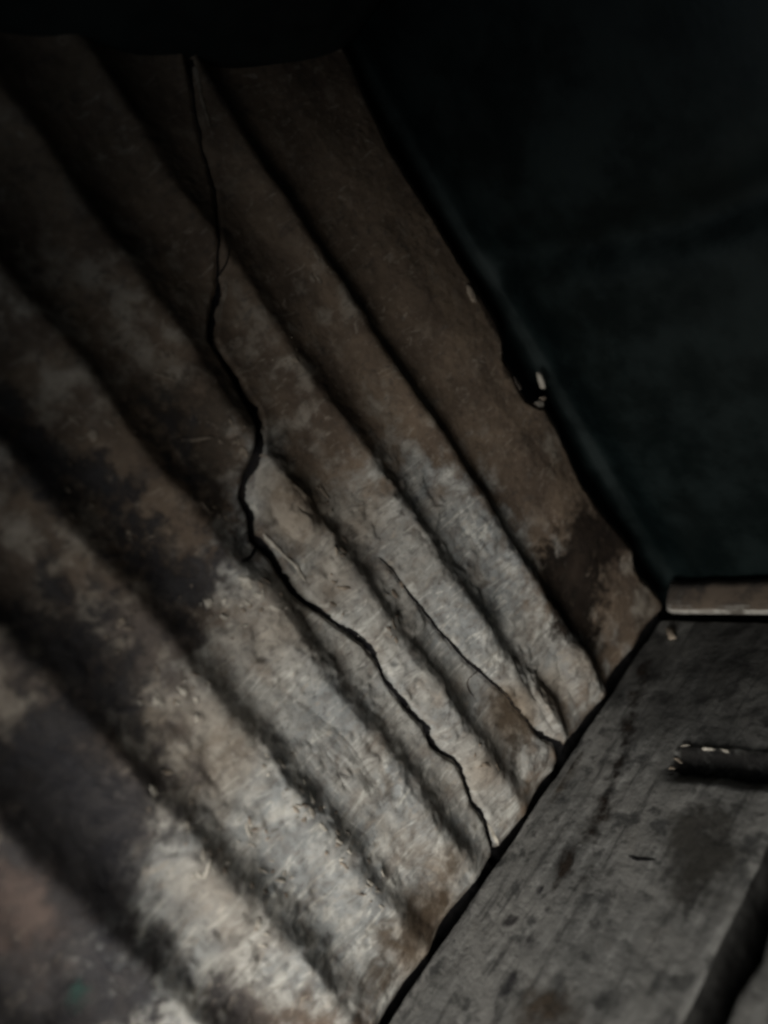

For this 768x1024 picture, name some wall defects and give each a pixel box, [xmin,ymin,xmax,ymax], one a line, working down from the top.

crack [186,58,499,851]
crack [378,557,564,756]